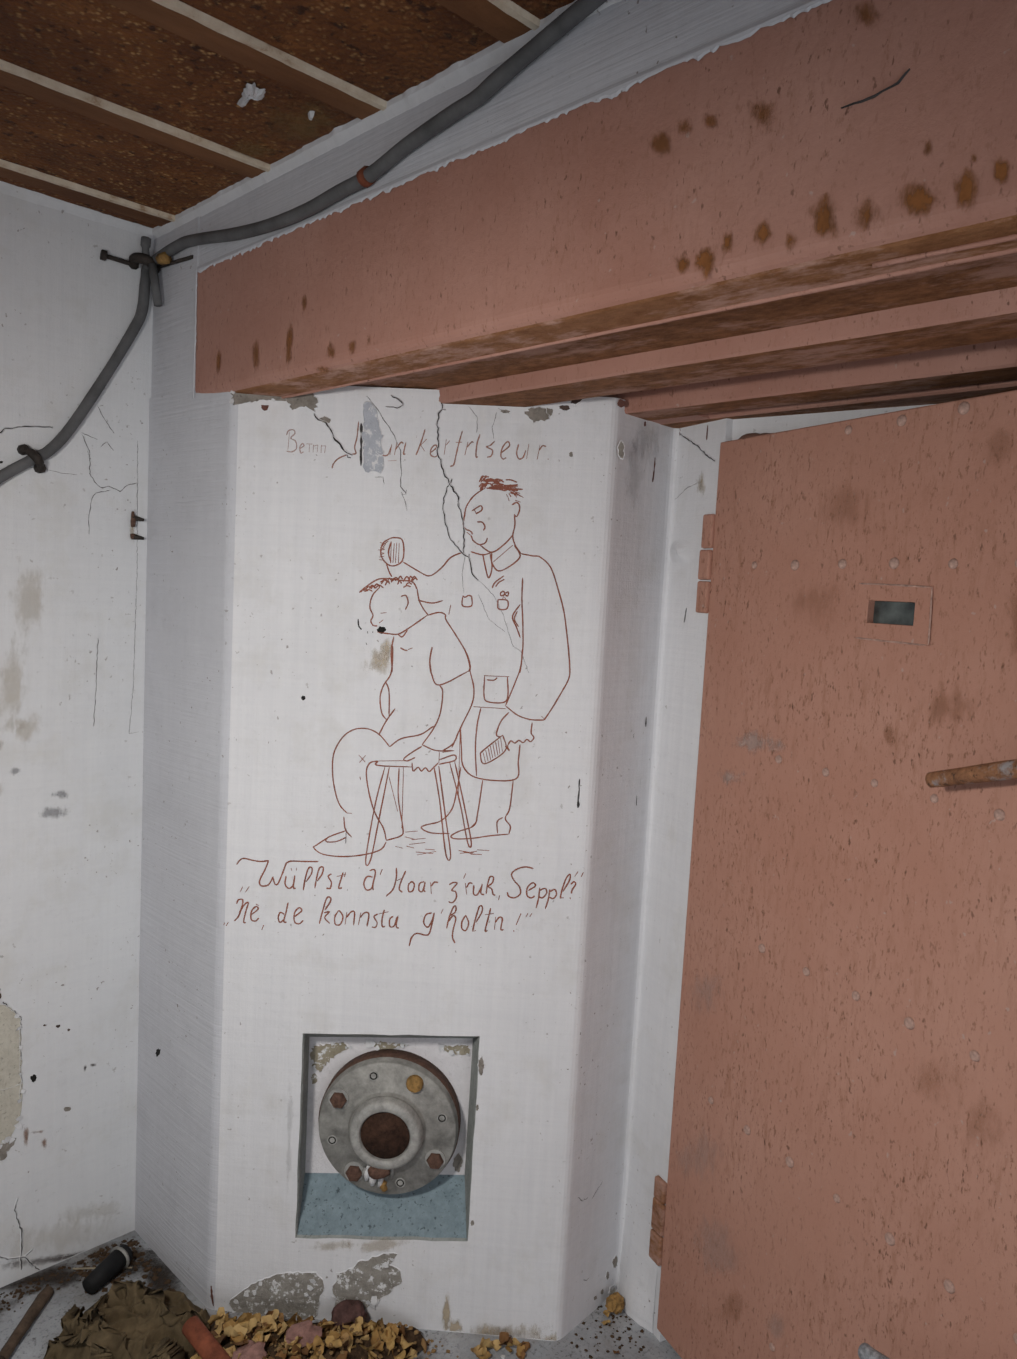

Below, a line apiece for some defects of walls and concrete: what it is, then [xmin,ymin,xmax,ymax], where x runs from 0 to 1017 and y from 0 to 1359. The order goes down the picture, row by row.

corrosion [652,133,669,152]
corrosion [755,223,771,242]
corrosion [815,195,835,235]
corrosion [904,185,933,215]
corrosion [955,156,977,205]
corrosion [994,161,1009,183]
corrosion [678,235,731,278]
crack [313,413,352,459]
crack [369,395,407,509]
crack [435,393,528,670]
flaking render [0,987,37,1161]
peeling [210,1252,403,1319]